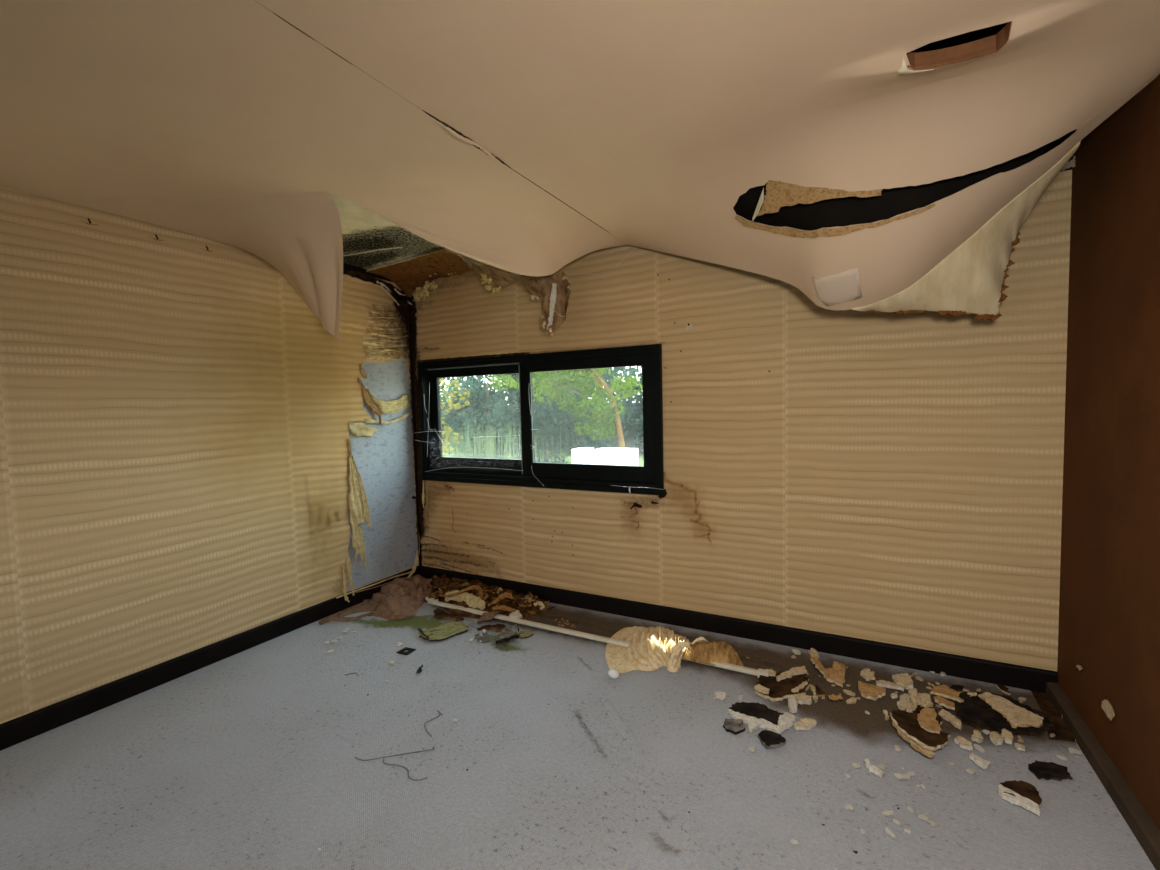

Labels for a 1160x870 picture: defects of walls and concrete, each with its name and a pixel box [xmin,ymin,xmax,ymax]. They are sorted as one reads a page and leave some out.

peeling [331,359,420,602]